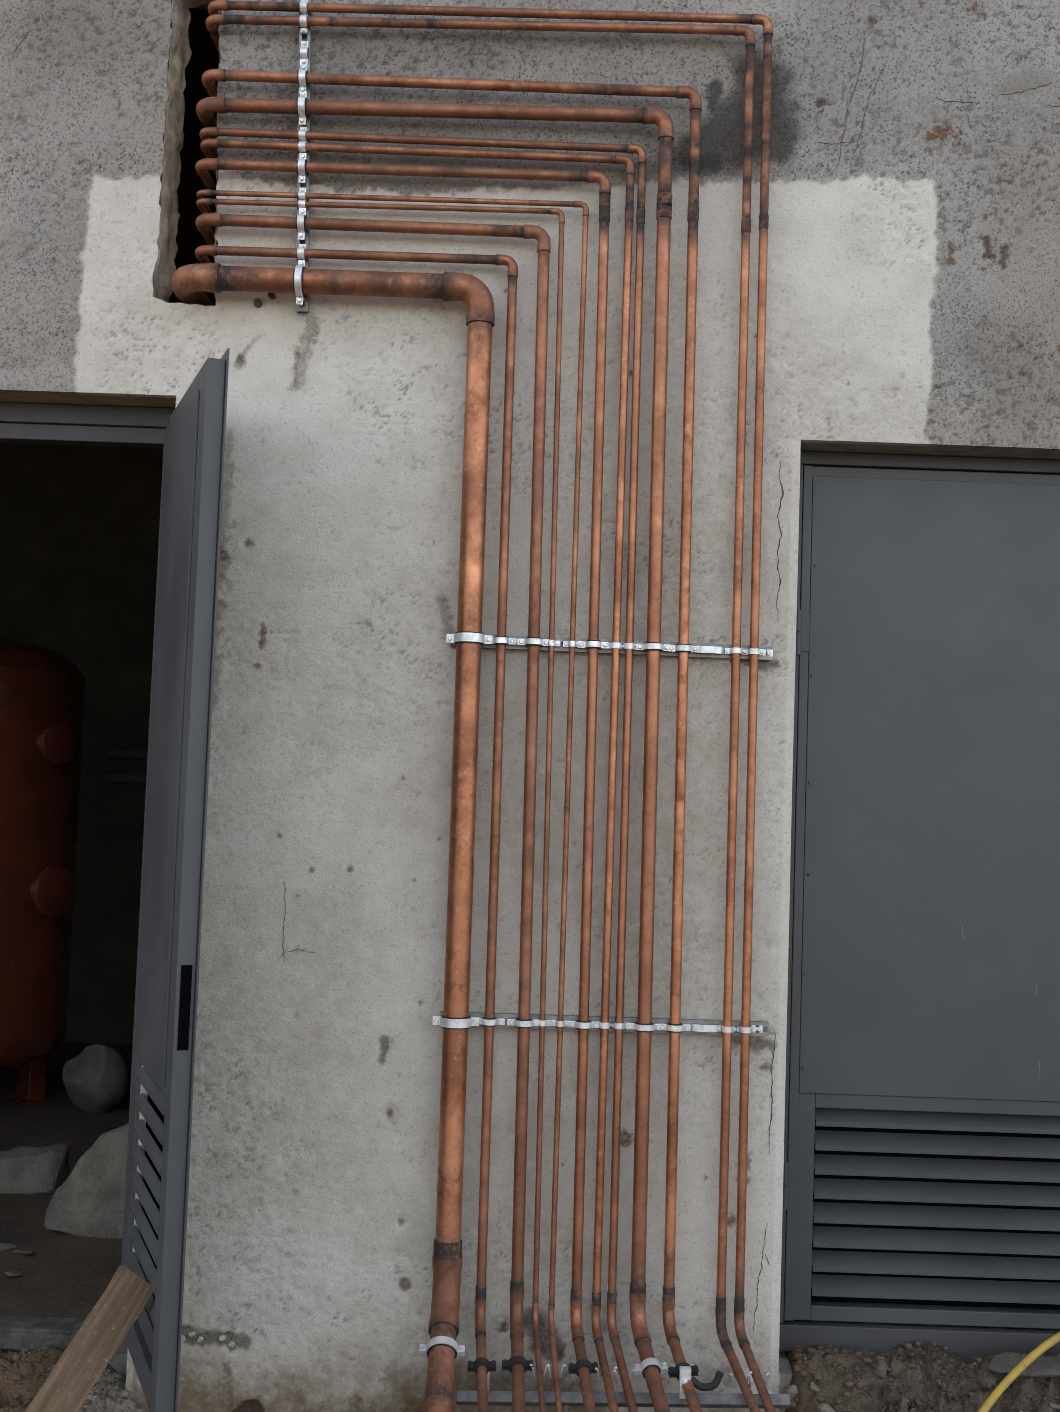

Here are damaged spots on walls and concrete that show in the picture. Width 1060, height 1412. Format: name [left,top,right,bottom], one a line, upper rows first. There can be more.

water stain [679,57,796,169]
corrosion [927,124,959,146]
corrosion [981,236,1008,269]
crack [776,461,784,612]
corrosion [254,624,267,667]
crack [768,1029,776,1153]
crack [753,1226,770,1332]